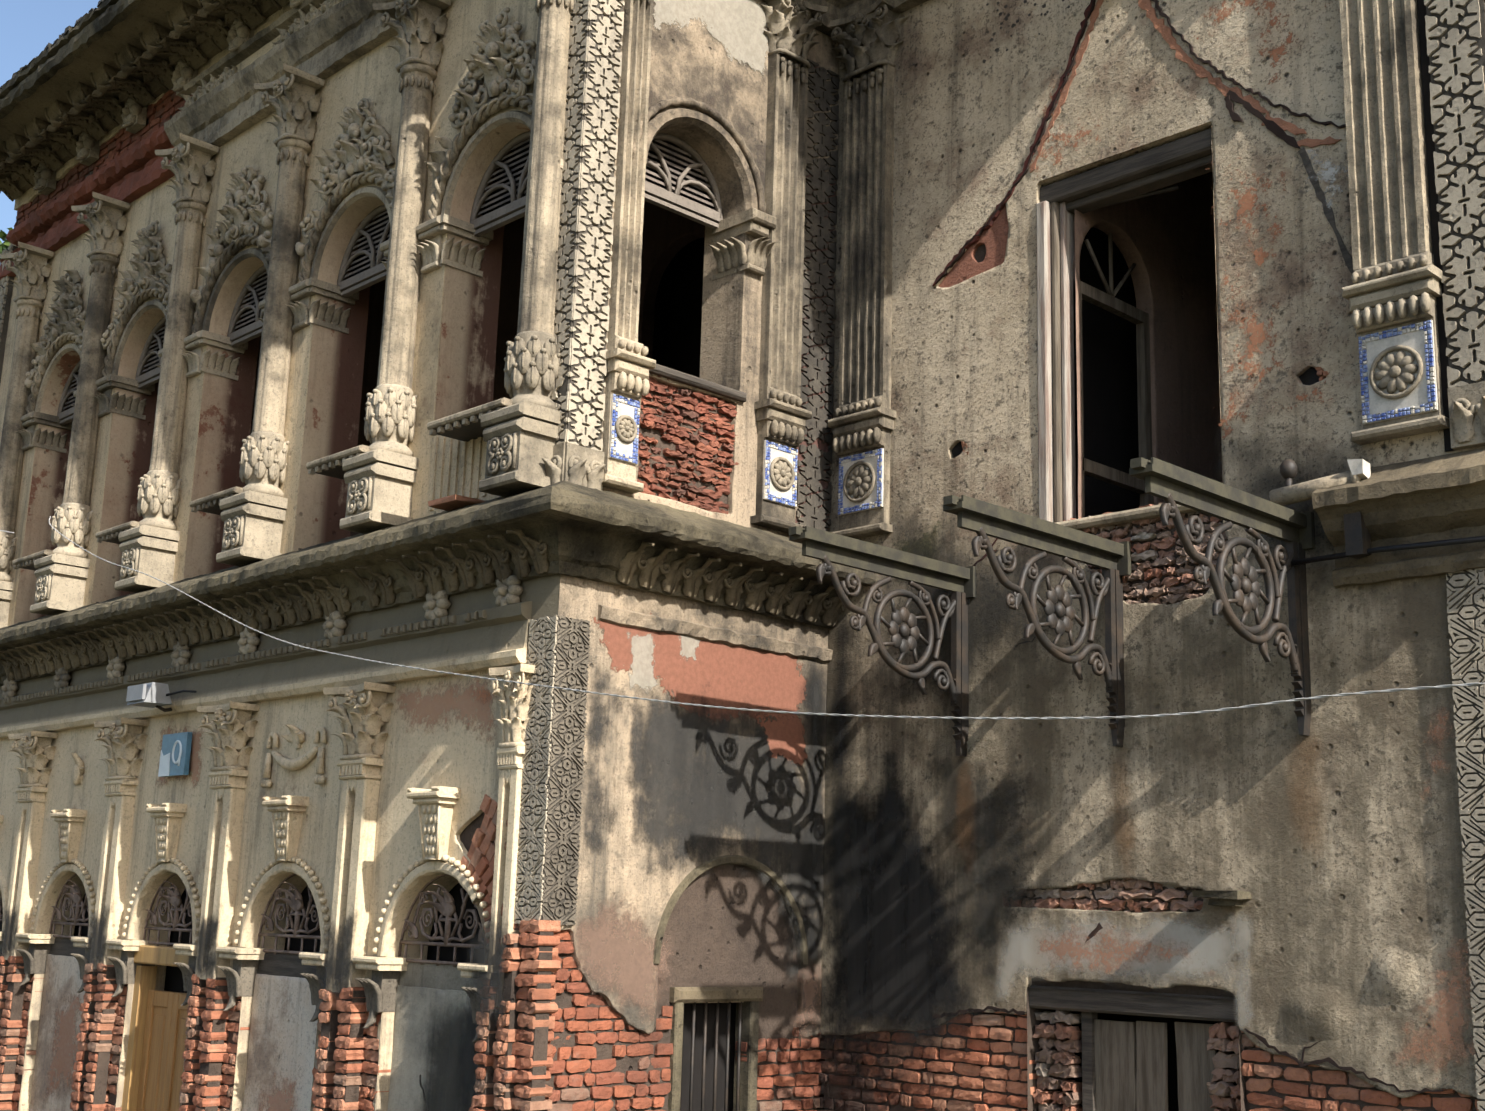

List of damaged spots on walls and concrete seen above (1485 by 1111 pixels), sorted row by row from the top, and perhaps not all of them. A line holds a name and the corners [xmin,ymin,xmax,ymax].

peeling [1194,0,1336,85]
peeling [1029,79,1100,181]
crack [932,0,1354,286]
peeling [1211,158,1333,440]
flaking render [593,613,808,766]
flaking render [461,794,673,1111]
damp [586,625,1249,1048]
flaking render [1011,878,1204,913]
peeling [1040,931,1187,973]
flaking render [735,966,1039,1111]
flaking render [1241,1031,1479,1111]